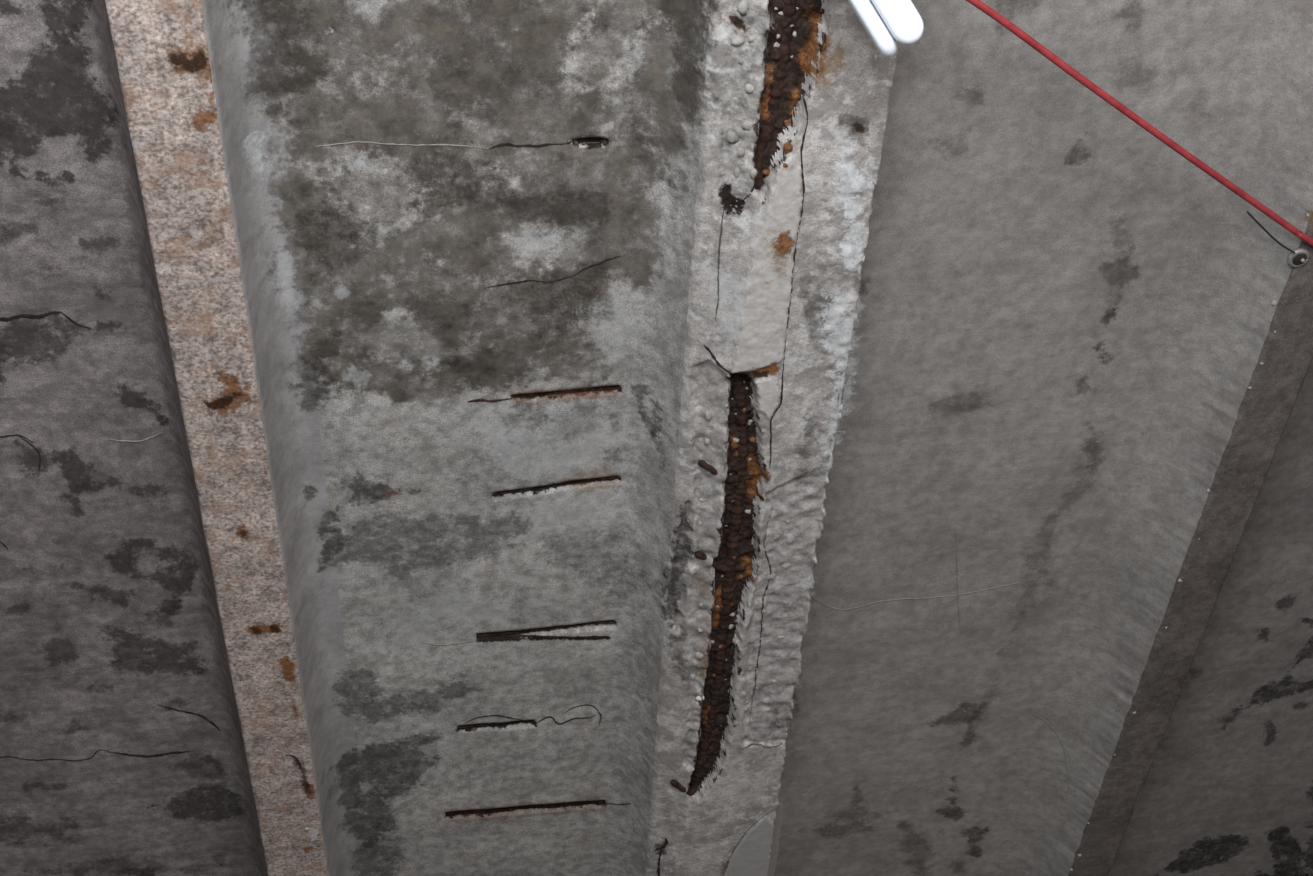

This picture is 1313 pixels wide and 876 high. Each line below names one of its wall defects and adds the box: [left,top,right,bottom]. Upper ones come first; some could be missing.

rust [729,16,748,31]
rust [168,46,213,79]
water stain [0,0,119,186]
water stain [243,0,718,403]
crack [0,311,92,365]
water stain [110,385,171,442]
rust [204,371,251,415]
spalling [662,0,841,796]
rust [734,363,781,378]
crack [0,434,49,476]
water stain [318,473,524,578]
water stain [71,538,204,675]